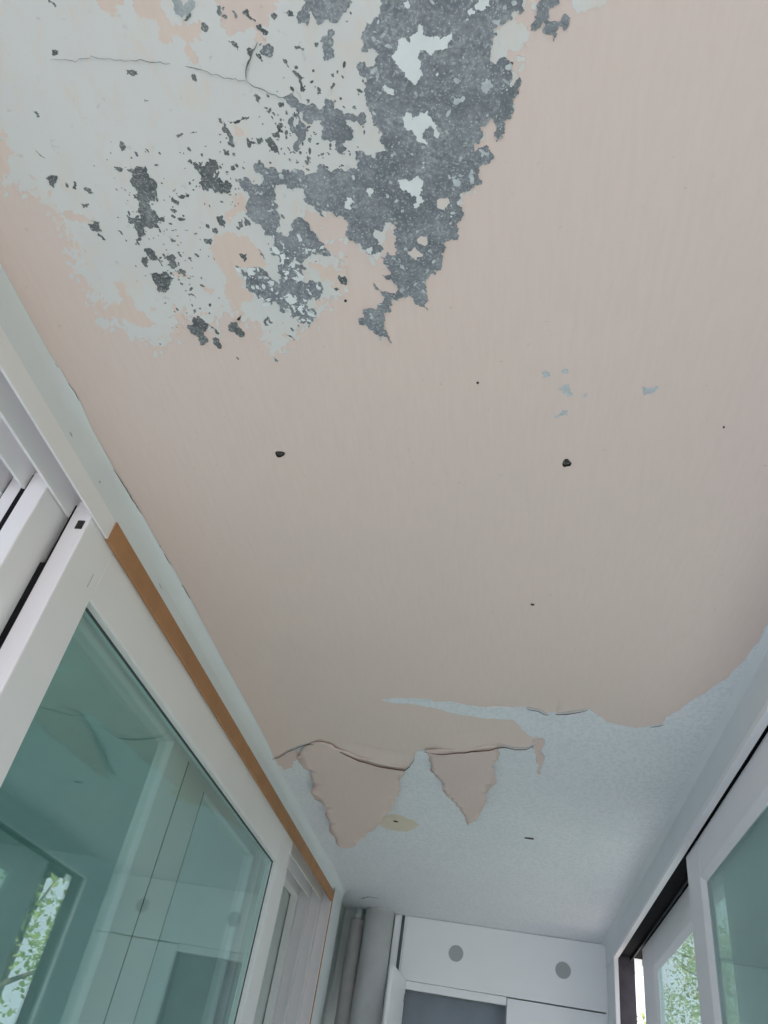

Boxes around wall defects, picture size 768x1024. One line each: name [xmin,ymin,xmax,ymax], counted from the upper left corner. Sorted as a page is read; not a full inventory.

crack [50,44,283,98]
peeling [0,0,607,362]
peeling [270,624,768,944]